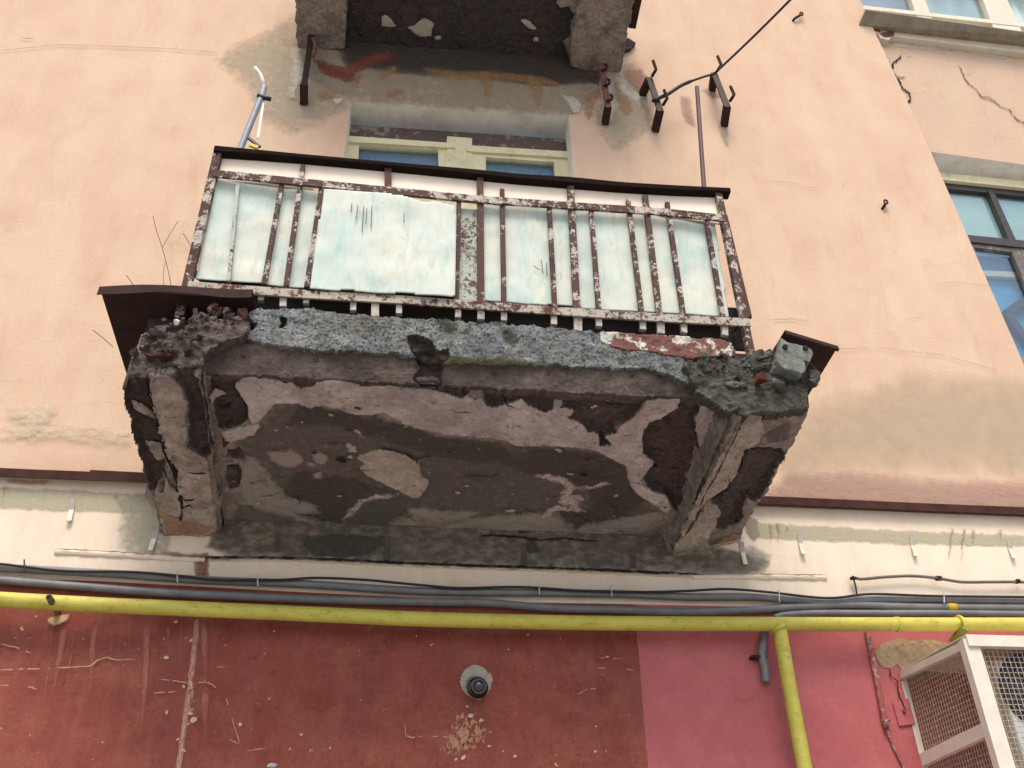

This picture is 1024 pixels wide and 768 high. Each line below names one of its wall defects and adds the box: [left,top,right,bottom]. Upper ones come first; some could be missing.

water stain [225,27,650,142]
peeling [626,70,647,92]
peeling [683,97,694,123]
crack [891,55,911,102]
crack [961,69,1024,123]
spalling [681,351,821,391]
crack [146,375,206,522]
peeling [3,302,786,557]
crack [59,449,821,576]
peeling [875,638,947,683]